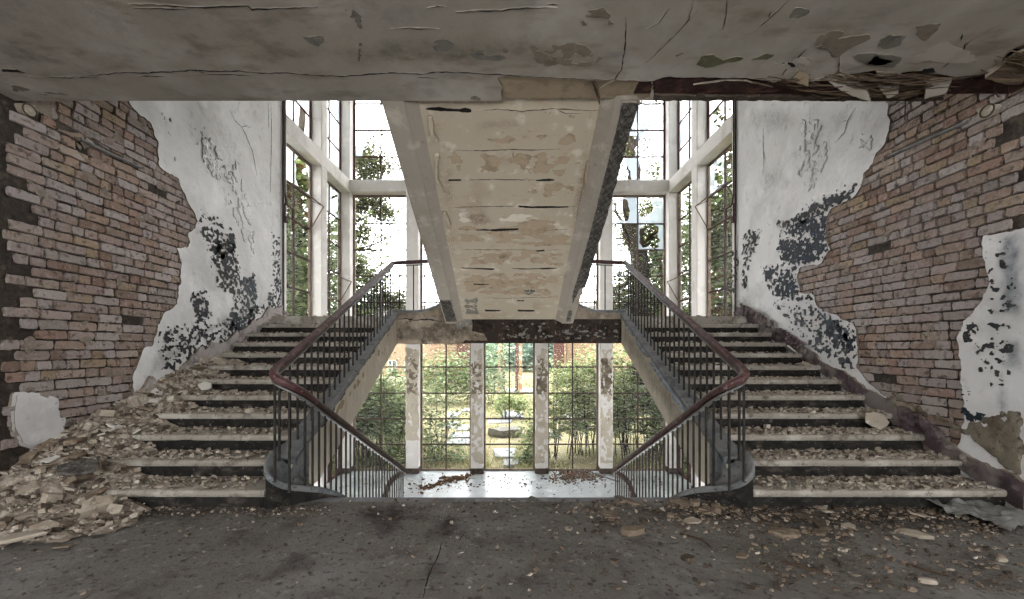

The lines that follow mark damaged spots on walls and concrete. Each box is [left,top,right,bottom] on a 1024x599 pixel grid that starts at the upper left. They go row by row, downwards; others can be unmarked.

crack [11,0,696,131]
spalling [426,96,481,113]
crack [721,0,729,29]
flaking render [815,23,979,67]
flaking render [0,85,282,477]
peeling [459,133,581,314]
flaking render [730,88,1024,475]
crack [422,533,464,599]